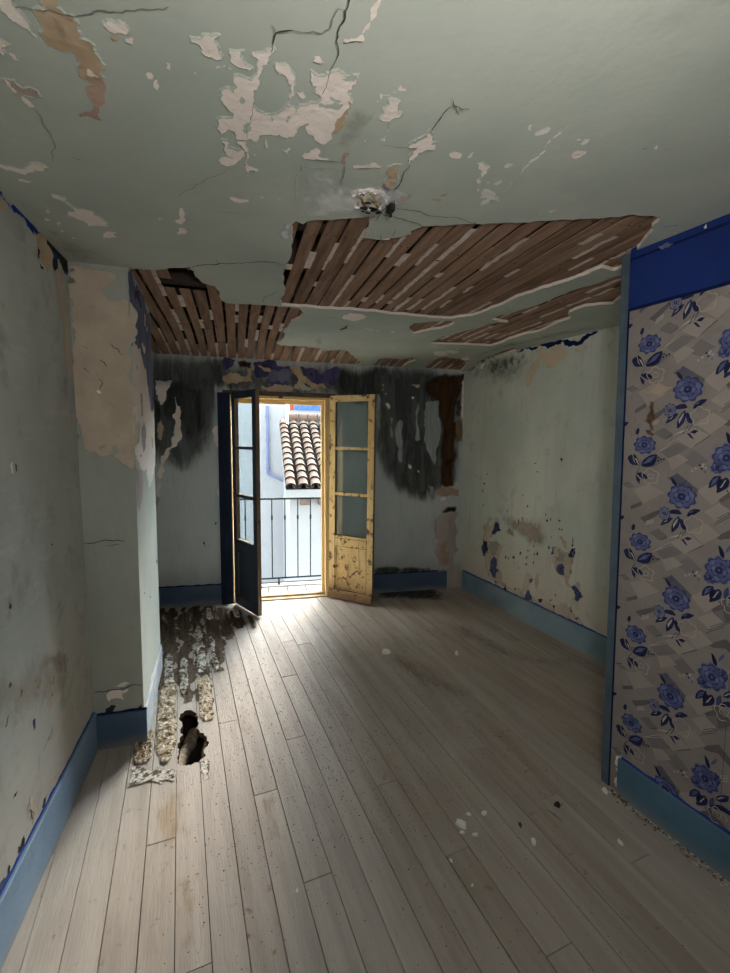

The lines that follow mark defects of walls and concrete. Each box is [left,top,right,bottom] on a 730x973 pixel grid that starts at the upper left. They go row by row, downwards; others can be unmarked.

peeling [0,0,108,121]
peeling [100,18,133,44]
crack [271,0,350,69]
crack [375,145,486,238]
flaking render [68,32,658,511]
water stain [152,358,270,468]
water stain [283,366,463,499]
spalling [433,483,461,588]